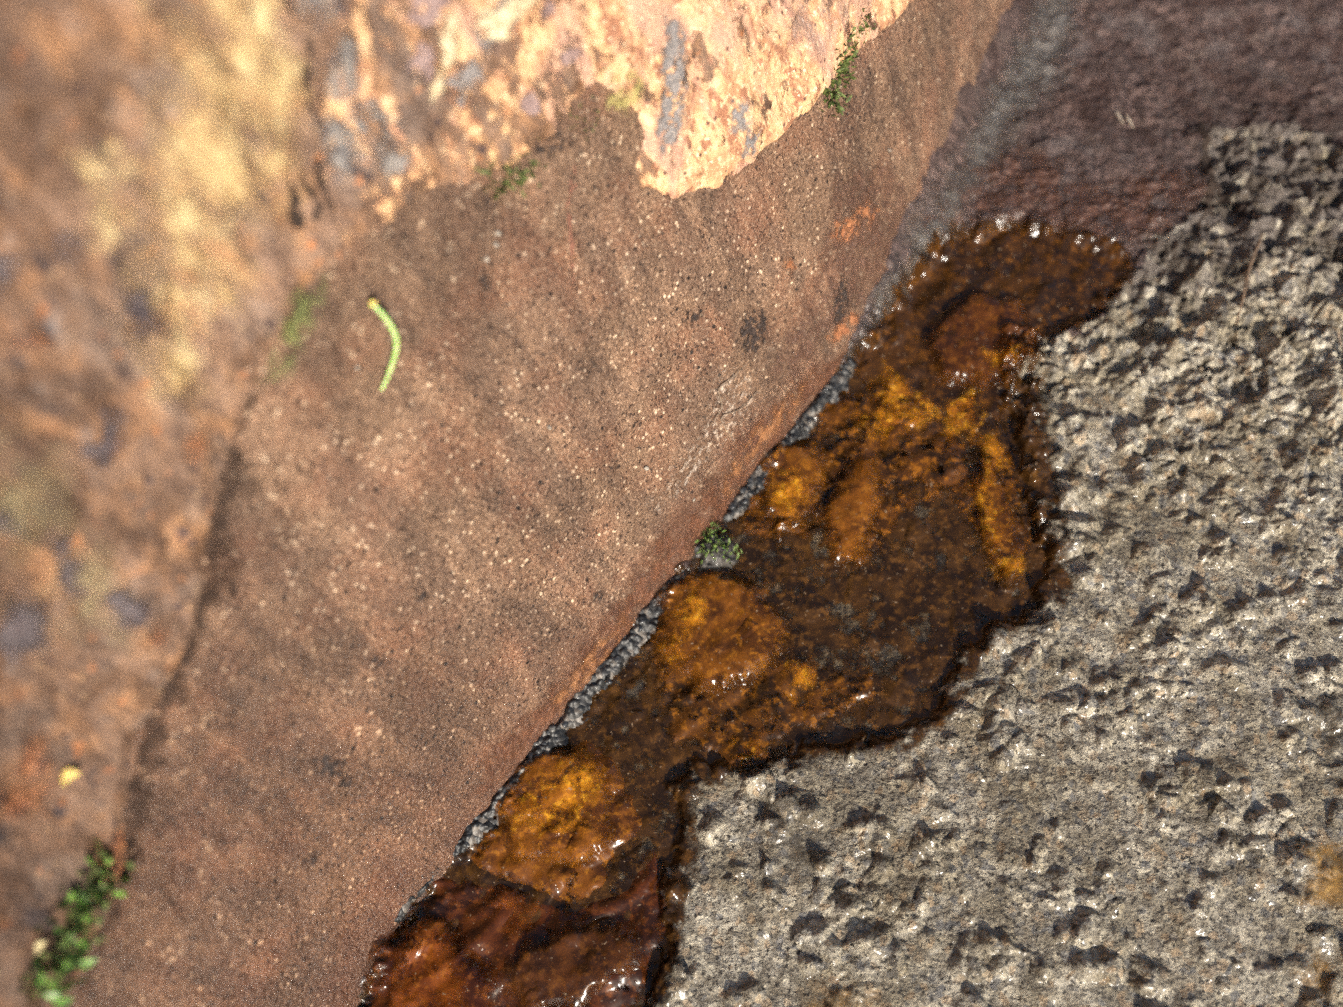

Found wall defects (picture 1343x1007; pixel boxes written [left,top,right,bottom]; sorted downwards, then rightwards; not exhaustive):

rust [0,0,721,1007]
rust [723,70,836,184]
rust [362,146,1203,1007]
rust [731,0,917,62]